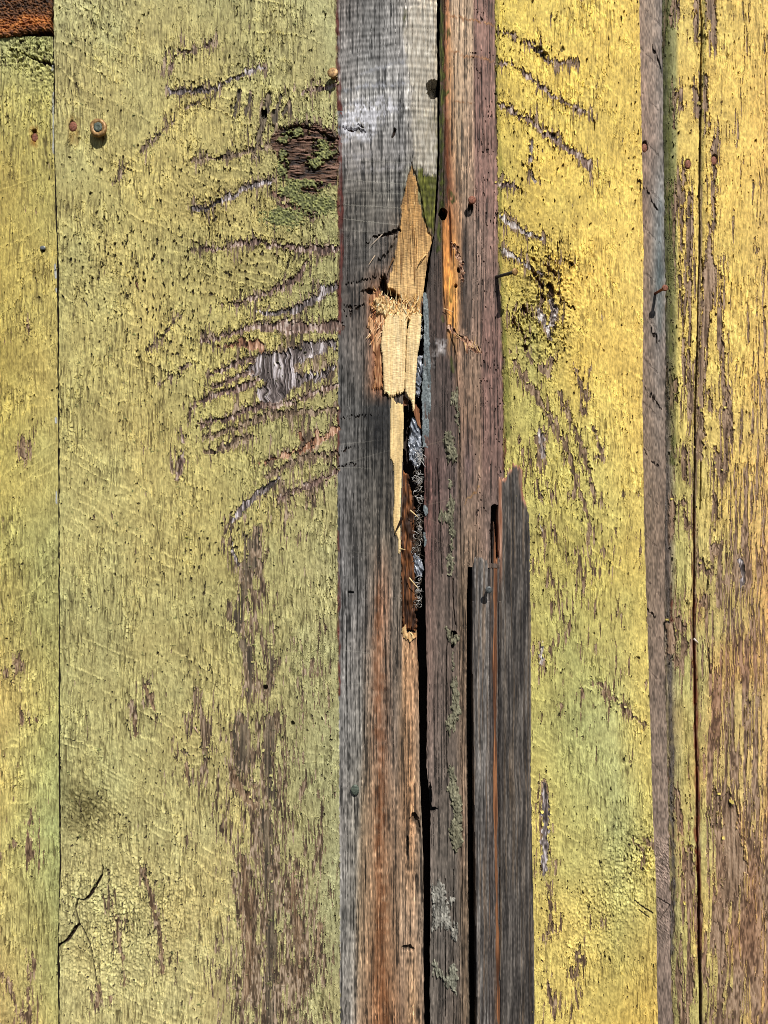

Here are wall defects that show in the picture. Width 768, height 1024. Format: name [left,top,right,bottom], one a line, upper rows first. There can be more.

peeling [168,66,288,164]
peeling [497,62,582,111]
peeling [498,103,592,183]
peeling [526,37,565,66]
peeling [190,180,314,217]
peeling [499,214,544,240]
peeling [501,248,555,289]
peeling [187,238,345,454]
peeling [511,298,558,340]
peeling [673,170,734,478]
peeling [229,717,278,1024]
crack [61,866,104,963]